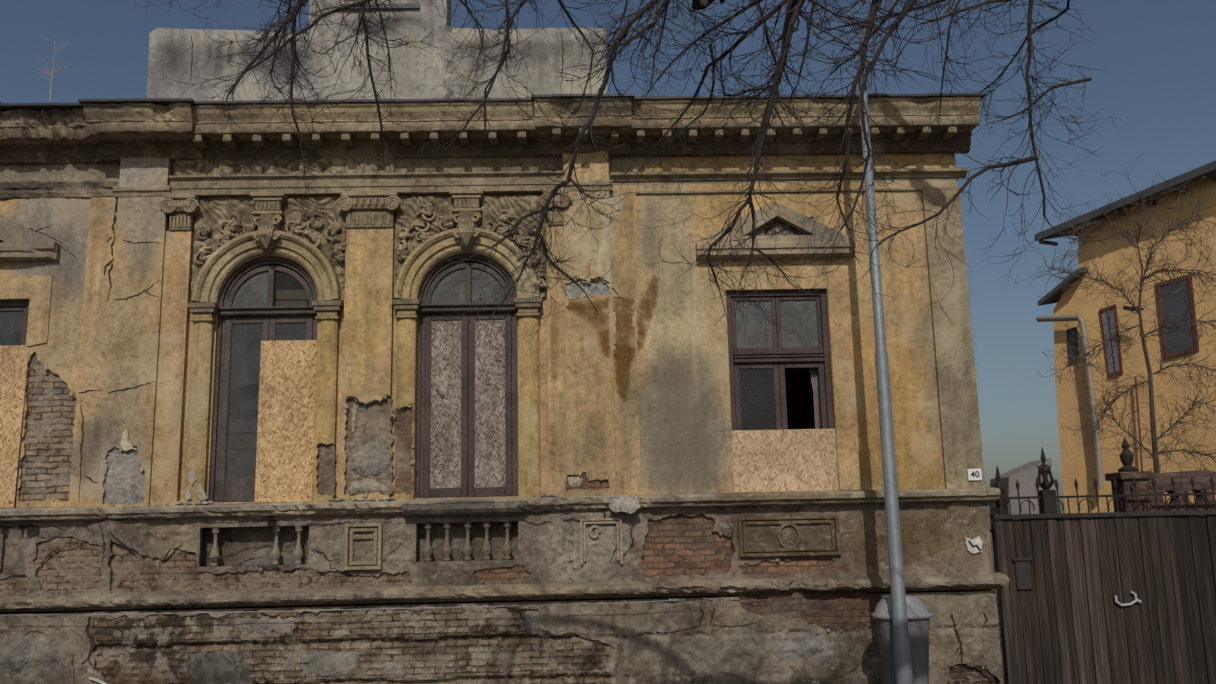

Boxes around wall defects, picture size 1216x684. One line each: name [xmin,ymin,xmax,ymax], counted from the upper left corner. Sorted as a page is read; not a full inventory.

crack [29,202,160,301]
spalling [565,279,611,299]
spalling [20,353,76,504]
spalling [101,429,145,506]
spalling [316,396,415,497]
spalling [565,472,833,578]
spalling [0,536,412,595]
spalling [88,606,617,684]
spalling [737,590,881,632]